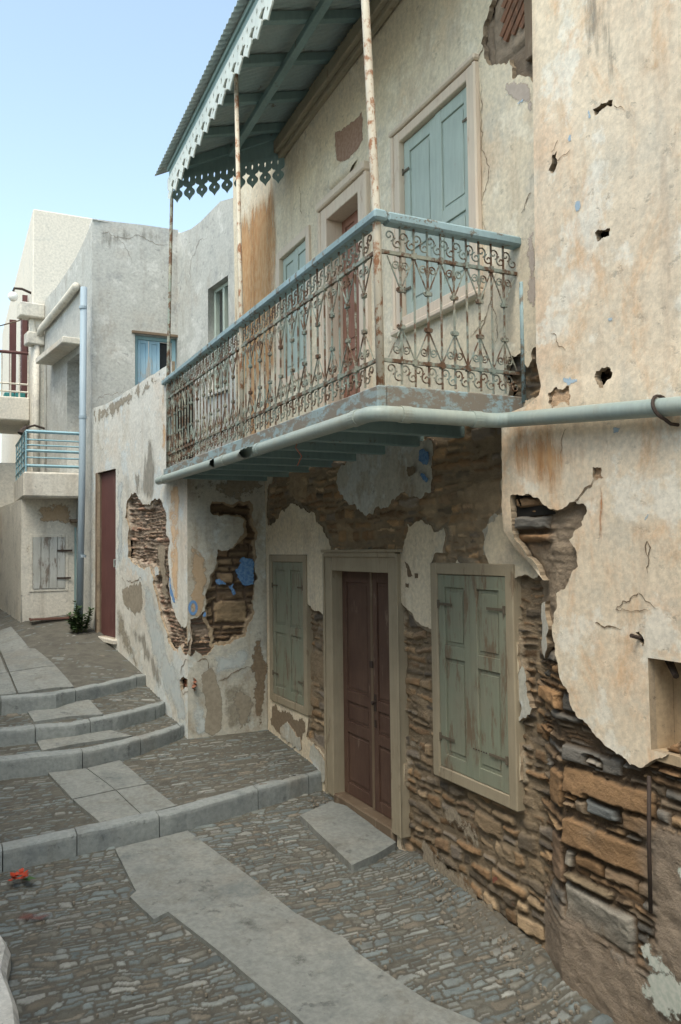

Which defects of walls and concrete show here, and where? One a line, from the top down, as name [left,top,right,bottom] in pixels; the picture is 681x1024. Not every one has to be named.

flaking render [481,0,533,111]
spalling [593,100,613,116]
spalling [595,228,610,241]
corrosion [241,193,275,435]
spalling [594,367,613,388]
spalling [97,468,136,664]
crack [596,542,654,628]
water stain [202,640,268,736]
flaking render [117,426,681,1024]